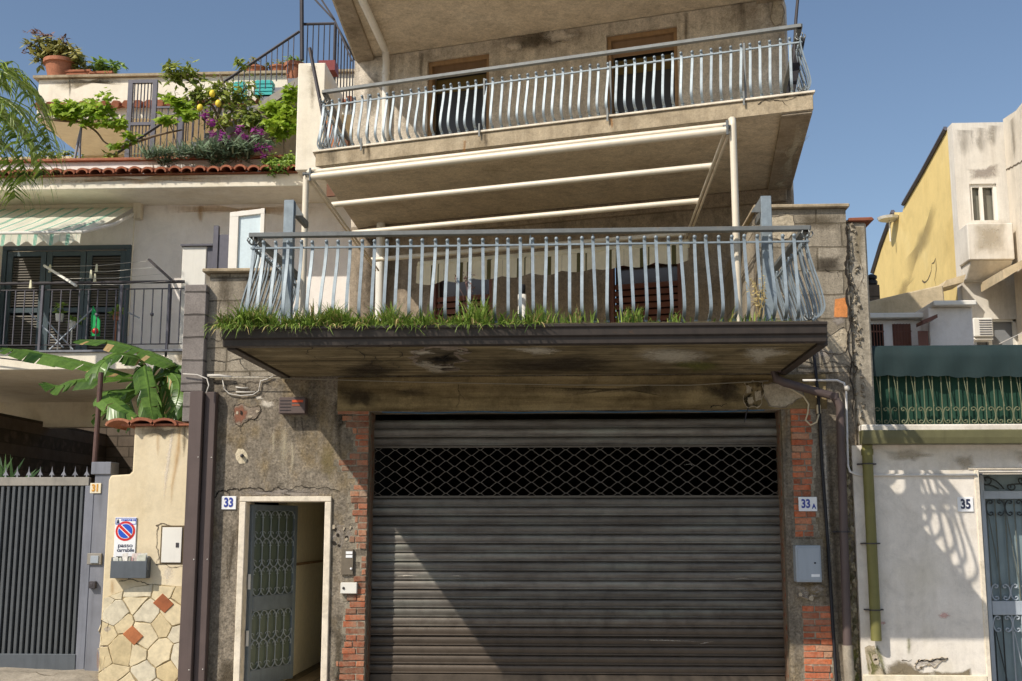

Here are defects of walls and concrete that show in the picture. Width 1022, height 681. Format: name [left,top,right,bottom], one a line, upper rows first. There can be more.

water stain [511,348,596,372]
water stain [645,350,697,363]
water stain [748,350,781,361]
water stain [336,391,370,425]
crack [805,218,866,678]
crack [215,483,338,498]
spalling [914,657,948,669]